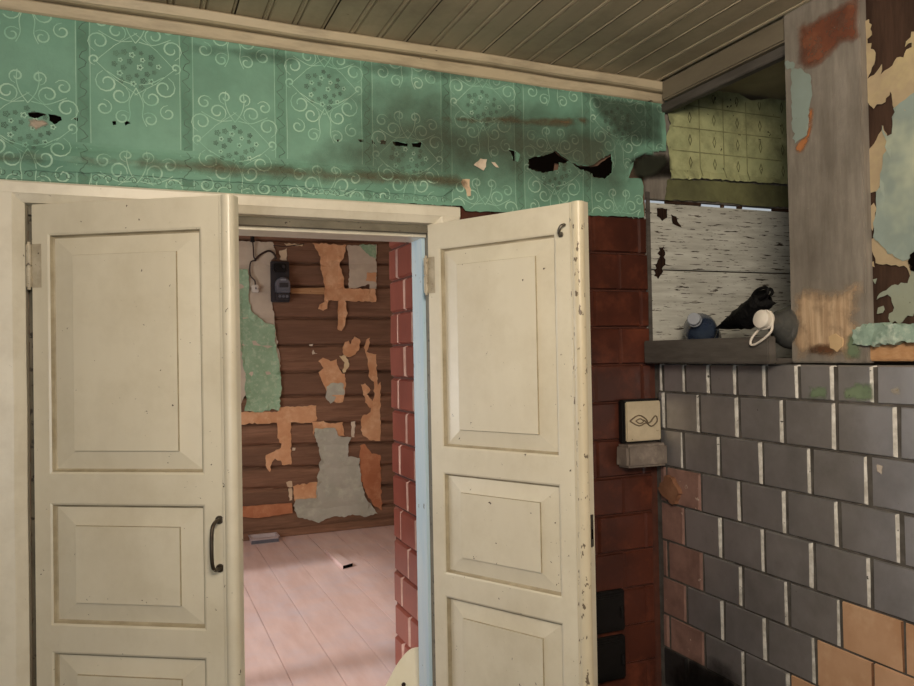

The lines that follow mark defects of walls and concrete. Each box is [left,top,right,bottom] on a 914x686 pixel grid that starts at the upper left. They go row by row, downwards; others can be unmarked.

water stain [395,116,605,169]
water stain [595,97,658,138]
peeling [785,60,812,143]
peeling [865,19,914,323]
peeling [657,208,682,228]
peeling [654,247,665,278]
peeling [795,286,859,357]